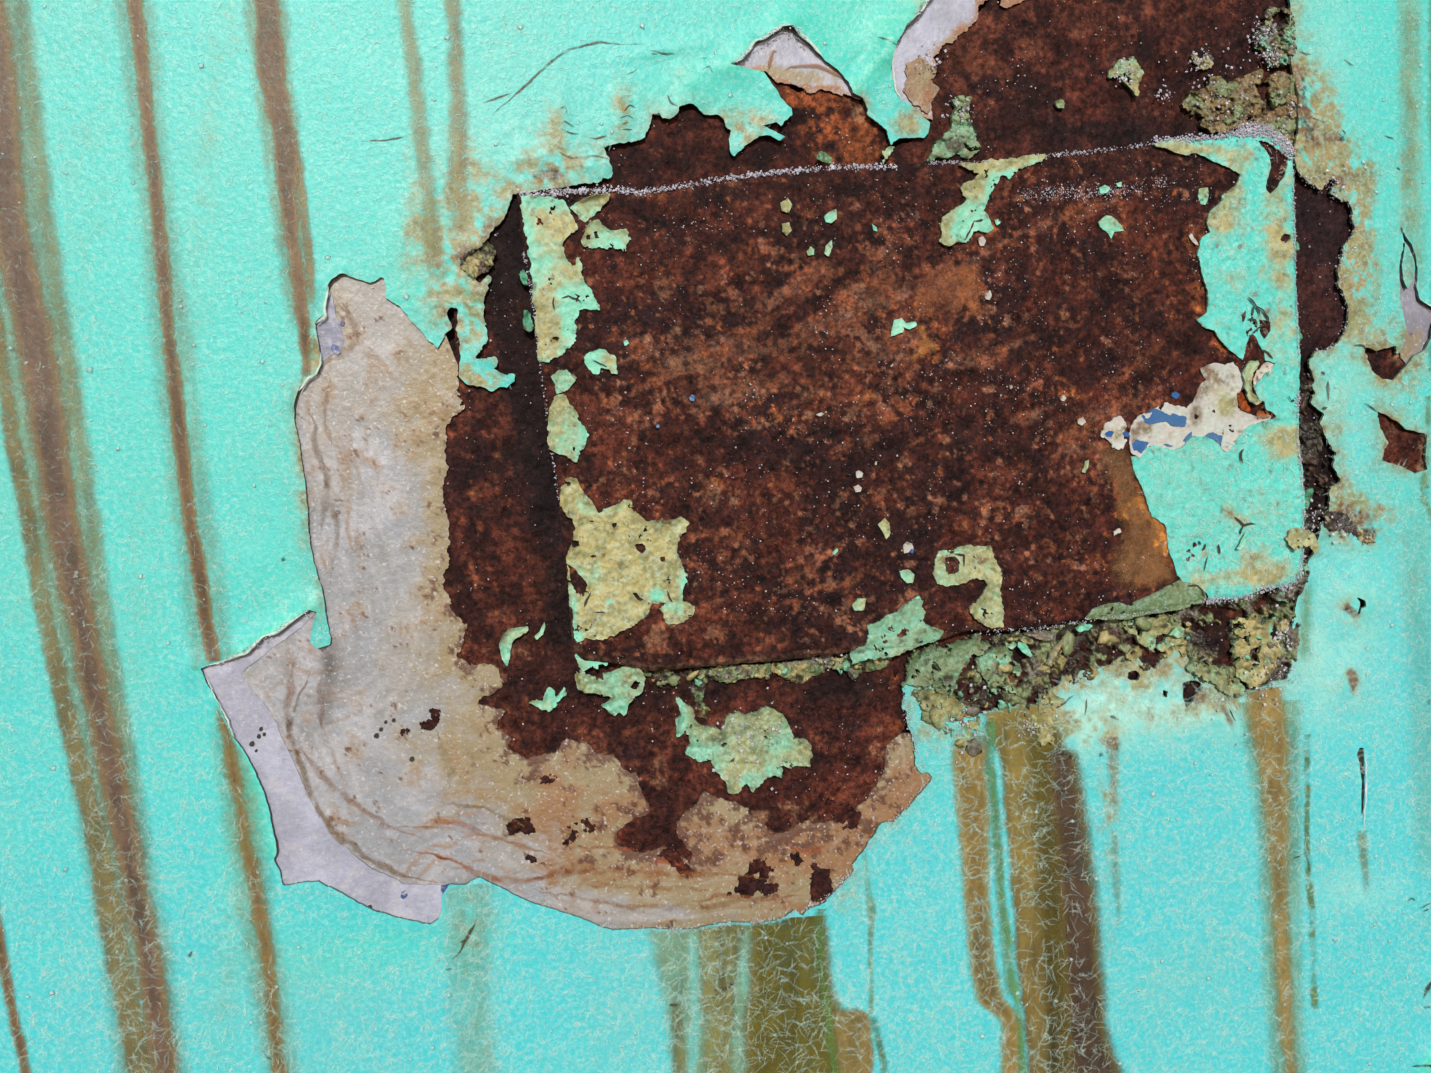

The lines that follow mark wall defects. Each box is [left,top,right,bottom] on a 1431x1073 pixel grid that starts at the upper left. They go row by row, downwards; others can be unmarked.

rust [0,0,177,1073]
rust [127,0,220,661]
rust [217,711,287,1073]
rust [250,0,314,375]
rust [400,708,441,736]
peeling [202,274,944,929]
peeling [520,193,695,716]
peeling [732,24,861,100]
rust [443,0,1376,1073]
peeling [932,544,1004,628]
peeling [891,0,1047,247]
peeling [1086,580,1206,620]